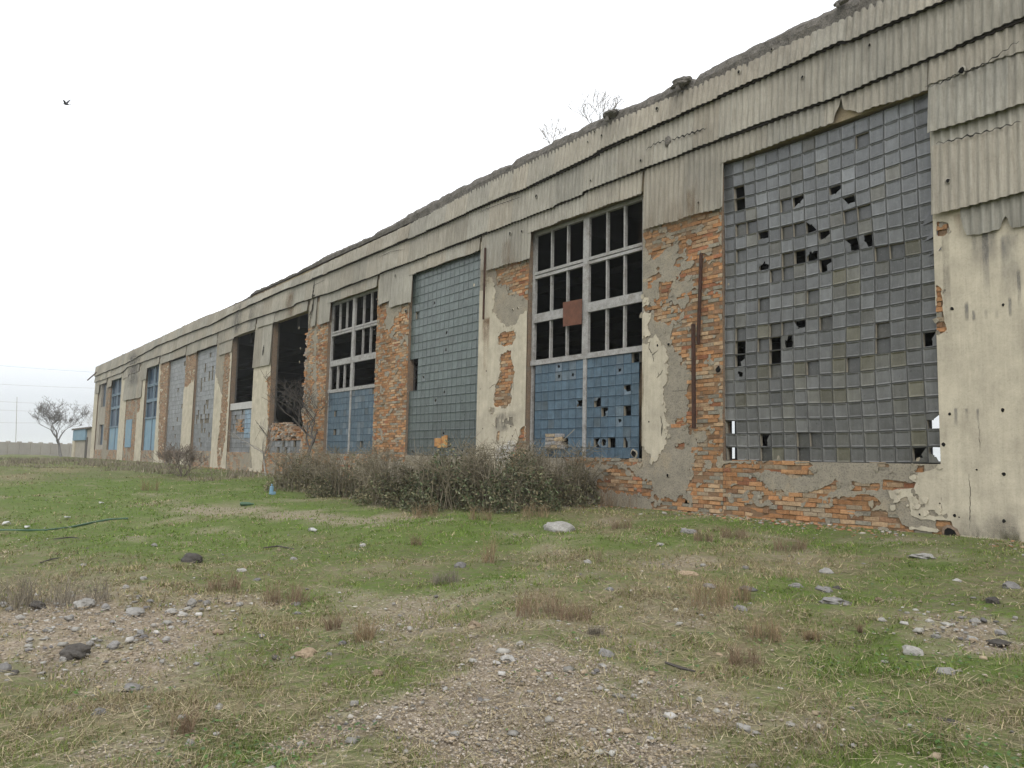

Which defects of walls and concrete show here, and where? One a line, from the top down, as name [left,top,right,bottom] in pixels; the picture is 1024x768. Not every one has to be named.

crack [936,121,1020,144]
peeling [473,259,533,467]
rust [563,299,582,327]
flaking render [564,207,953,535]